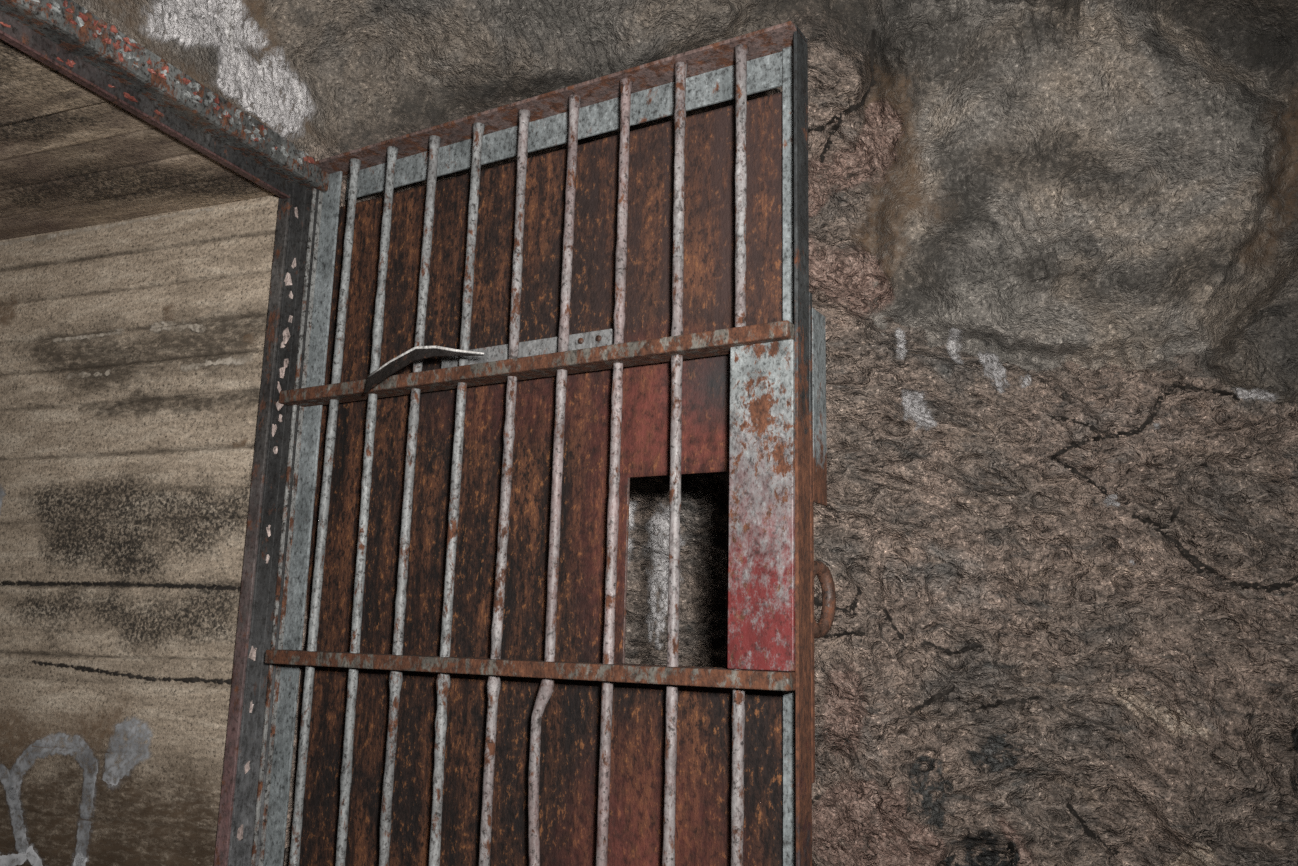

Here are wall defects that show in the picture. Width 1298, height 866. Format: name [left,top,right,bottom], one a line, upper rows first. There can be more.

crack [1050,383,1240,495]
water stain [15,478,251,645]
crack [1132,502,1298,593]